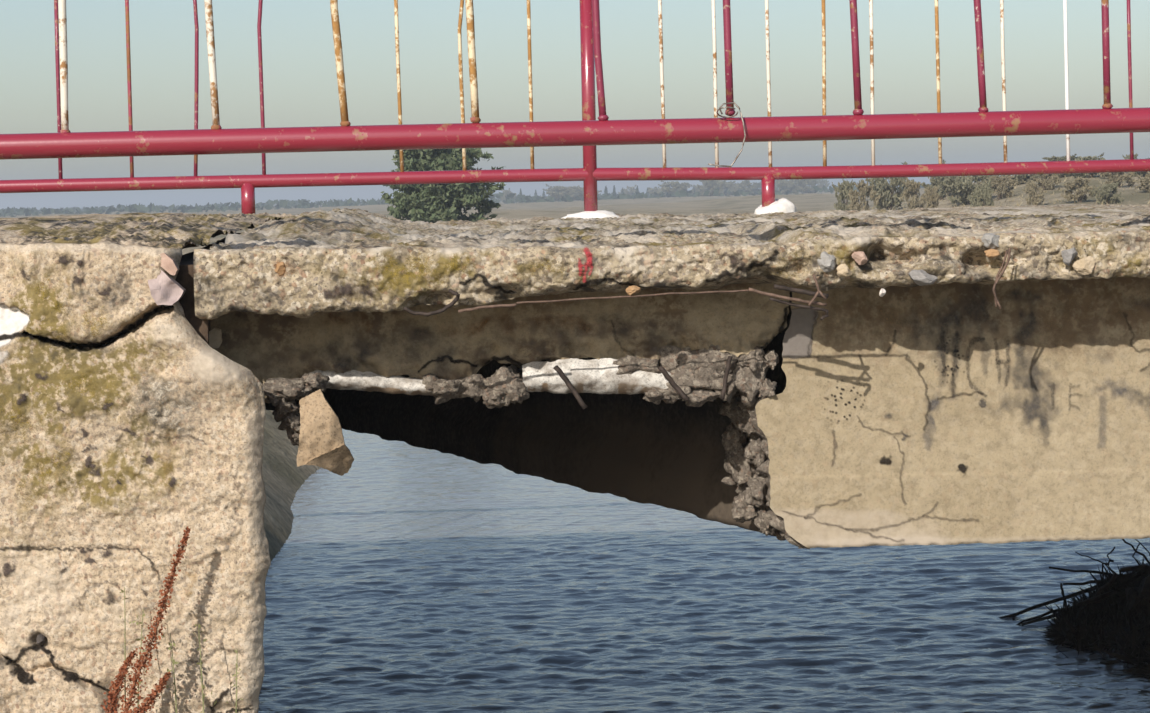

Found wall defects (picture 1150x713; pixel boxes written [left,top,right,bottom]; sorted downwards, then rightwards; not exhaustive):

spalling [0,305,29,362]
crack [0,305,174,351]
crack [760,307,982,420]
damp [1024,367,1046,425]
spalling [308,344,810,549]
crack [2,644,117,709]